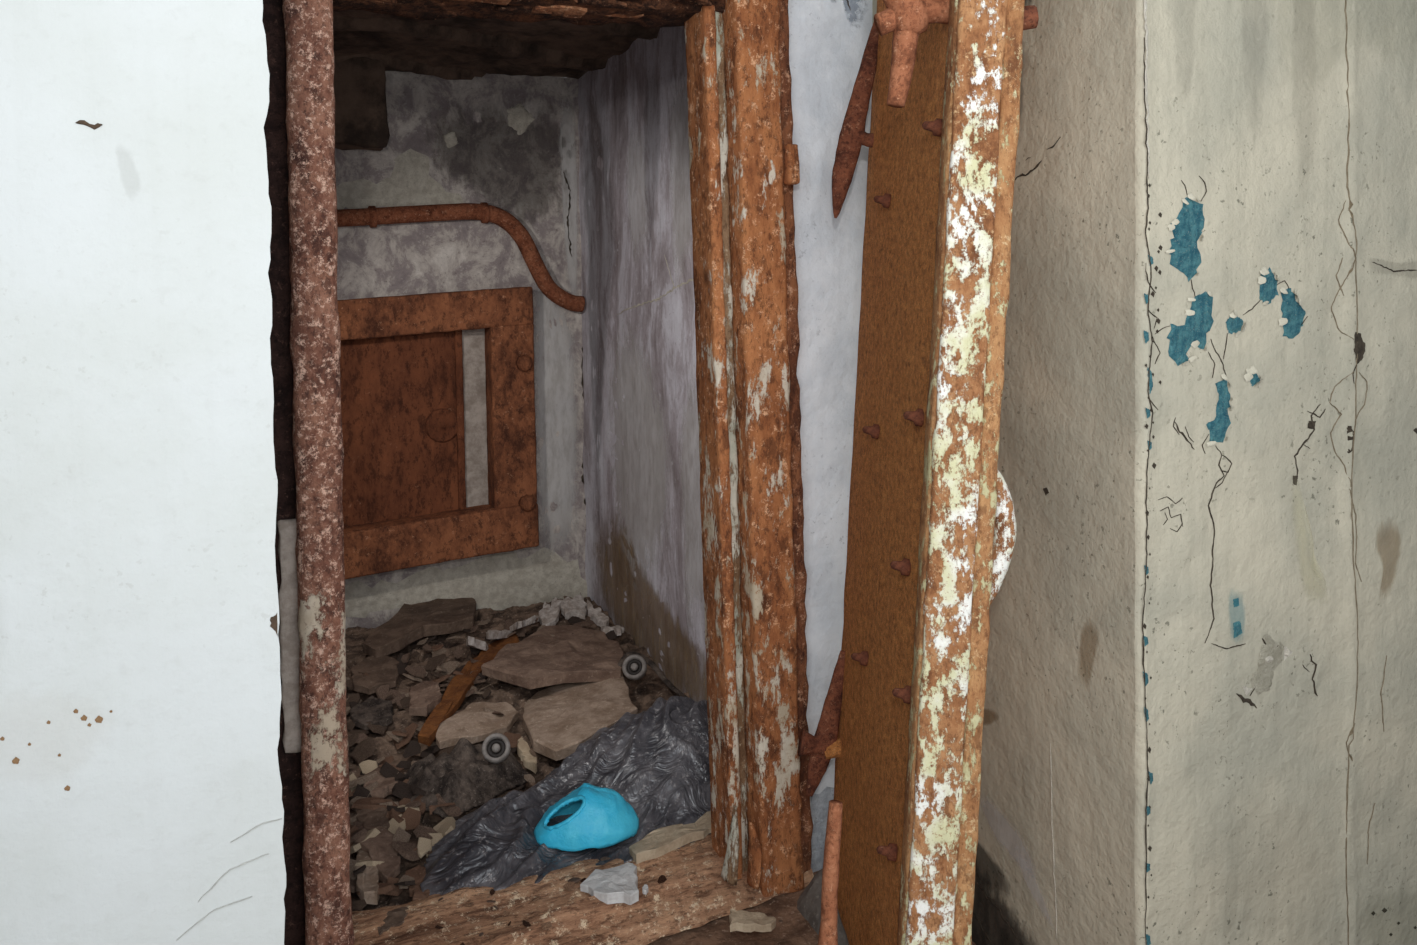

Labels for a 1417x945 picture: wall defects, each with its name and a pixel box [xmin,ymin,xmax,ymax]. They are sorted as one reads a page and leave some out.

rust [457,0,712,19]
peeling [1155,176,1308,454]
crack [1142,37,1244,945]
crack [1293,0,1387,945]
rust [73,709,112,727]